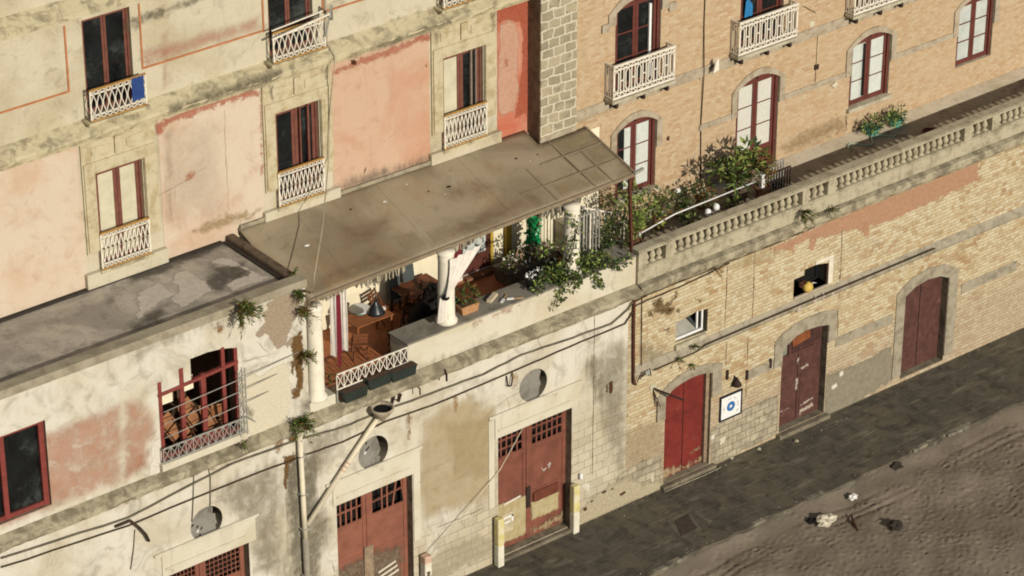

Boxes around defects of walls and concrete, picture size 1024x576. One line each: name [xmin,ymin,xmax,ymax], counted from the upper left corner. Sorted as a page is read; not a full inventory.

peeling [497,1,528,118]
flaking render [770,162,979,253]
leakage [131,241,269,328]
spalling [256,293,304,399]
peeling [498,492,564,543]